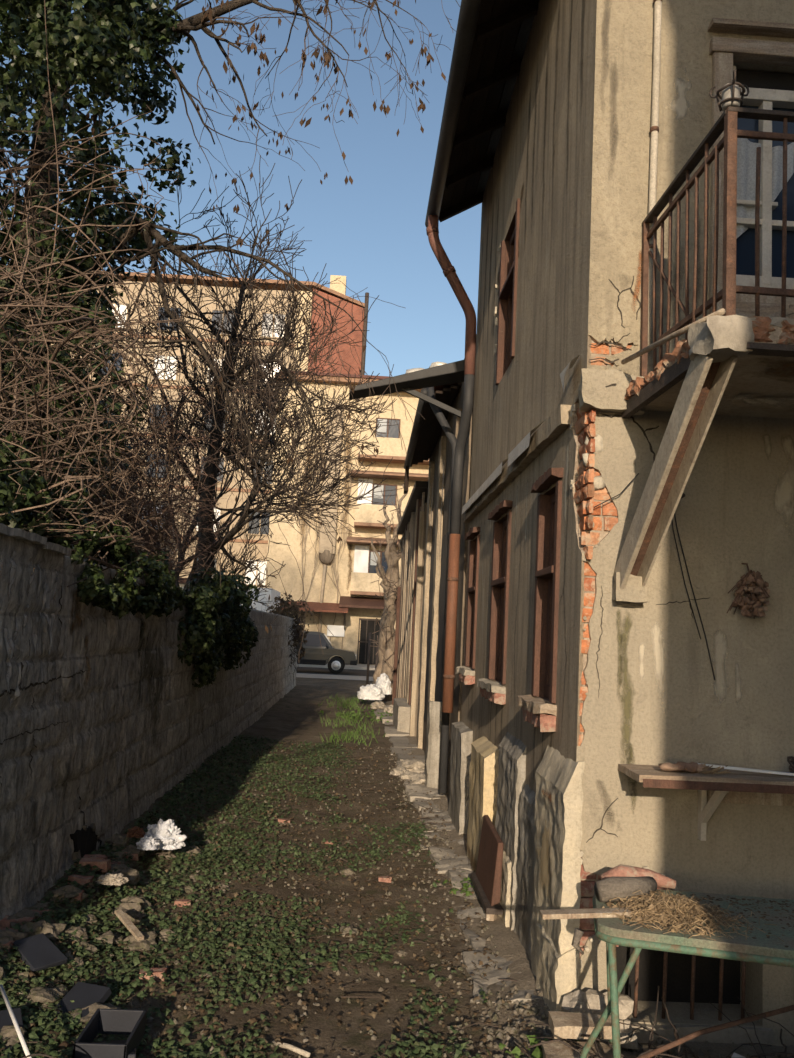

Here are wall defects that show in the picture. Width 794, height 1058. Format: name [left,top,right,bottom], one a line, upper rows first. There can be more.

spalling [590,336,638,370]
crack [589,276,641,363]
spalling [625,337,690,400]
spalling [748,315,794,345]
spalling [570,404,618,657]
crack [0,585,91,778]
spalling [575,672,589,746]
leakage [617,612,664,764]